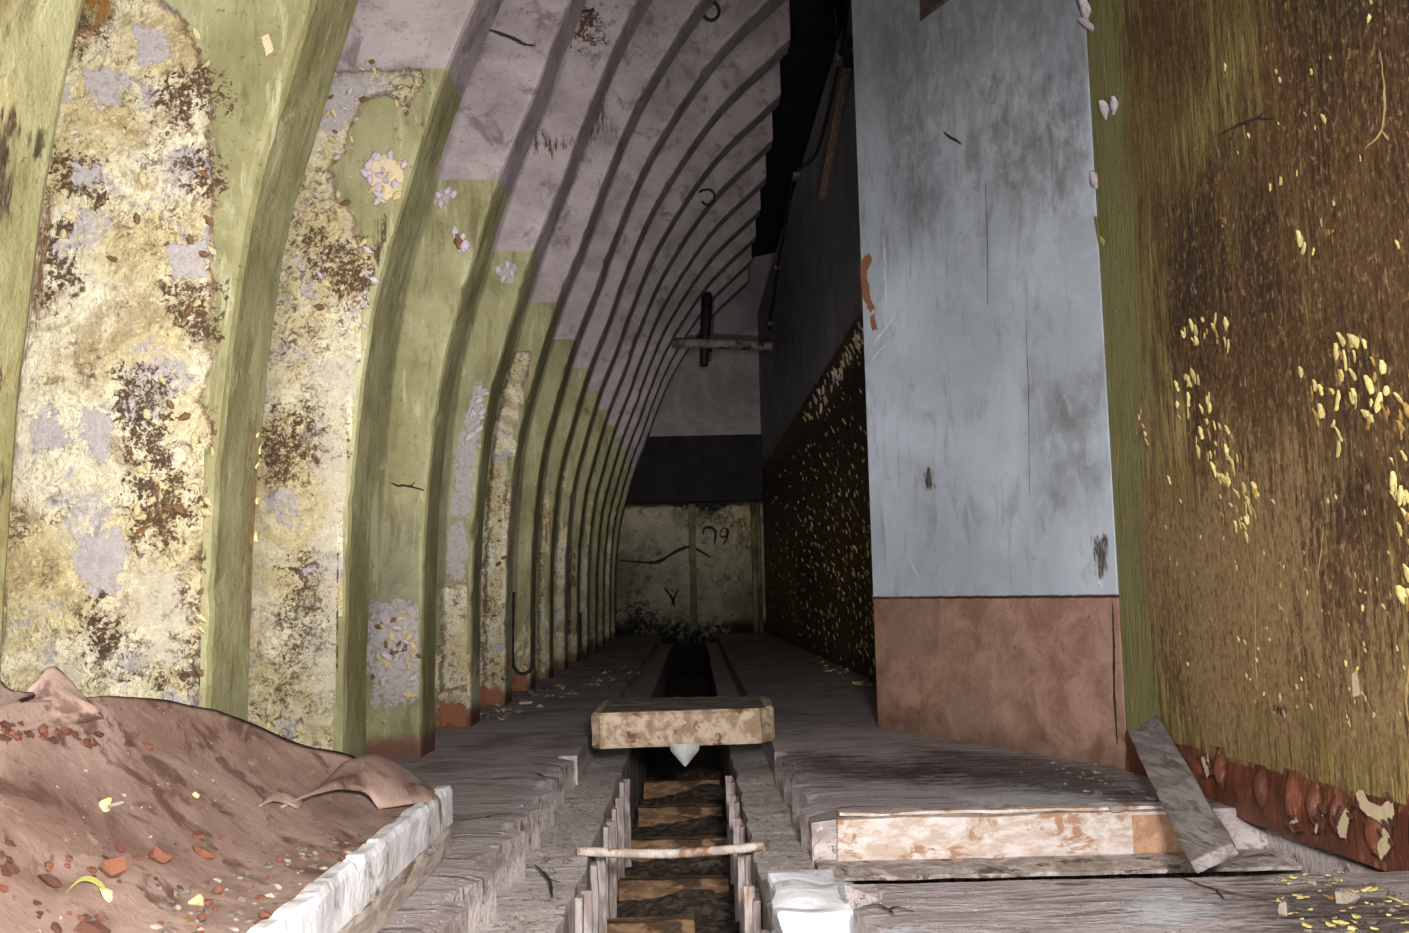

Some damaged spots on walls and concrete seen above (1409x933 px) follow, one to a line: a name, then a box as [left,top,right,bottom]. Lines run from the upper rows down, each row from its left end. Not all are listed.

peeling [1,0,242,706]
peeling [242,59,426,750]
peeling [366,349,533,713]
damp [1123,0,1409,646]
peeling [1132,0,1409,860]